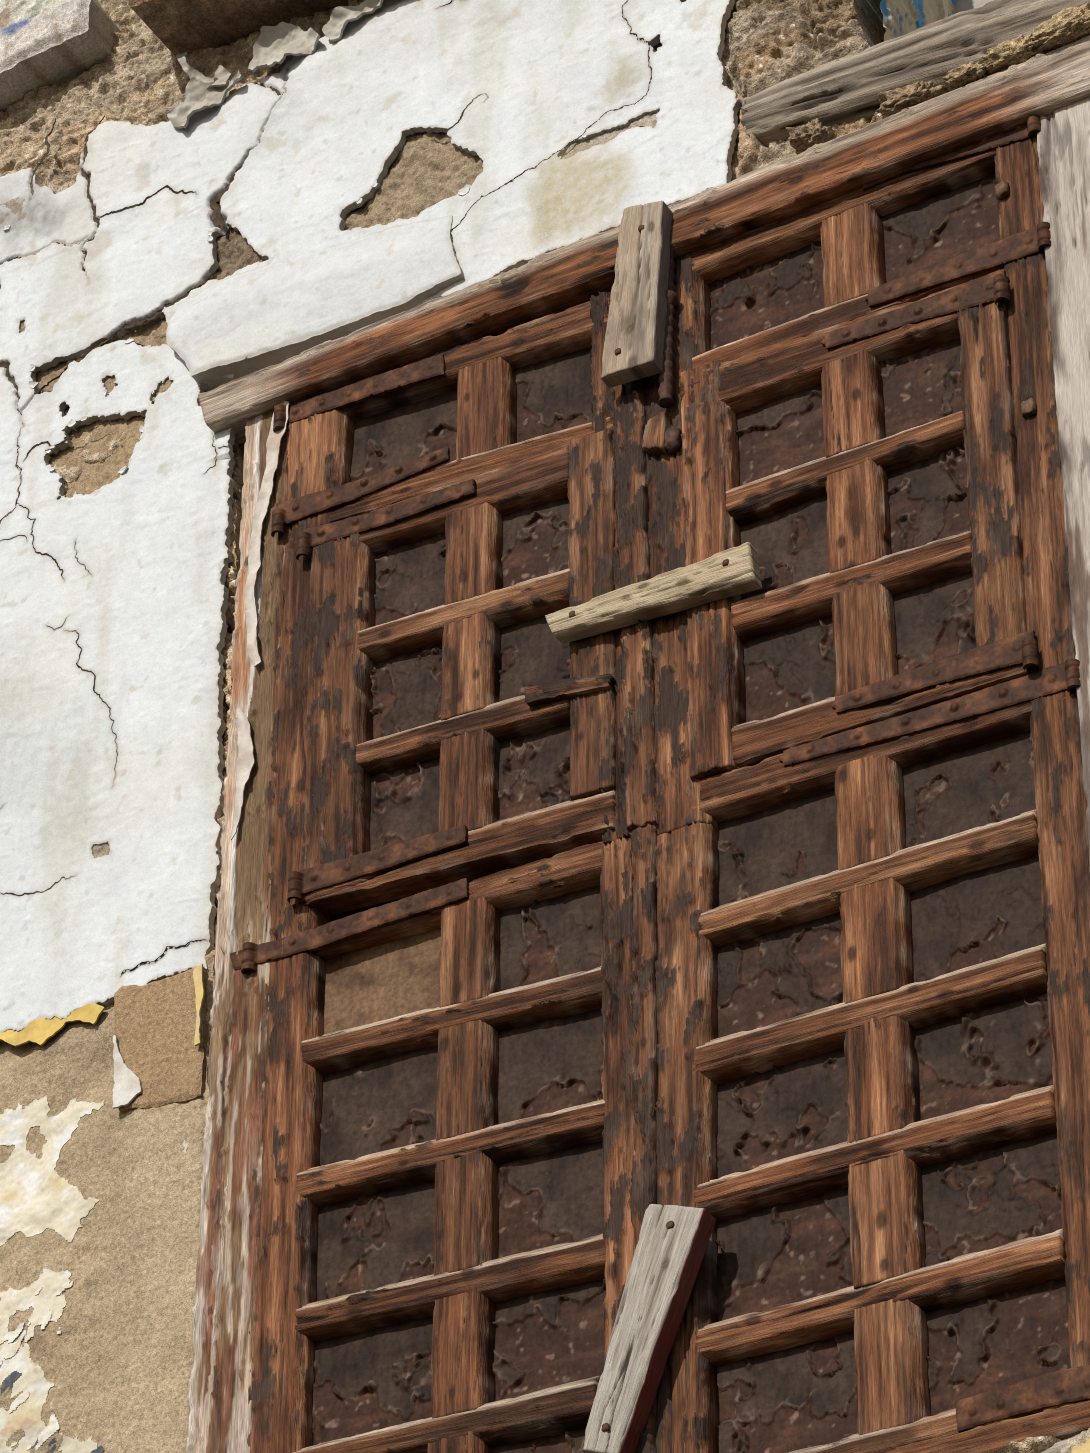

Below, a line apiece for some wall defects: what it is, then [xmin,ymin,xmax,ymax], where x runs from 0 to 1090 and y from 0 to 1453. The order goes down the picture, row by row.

crack [0,115,264,289]
flaking render [344,132,483,231]
crack [450,0,652,280]
crack [0,271,216,579]
flaking render [46,377,173,498]
crack [47,617,118,778]
crack [1,876,71,896]
peeling [0,1003,105,1047]
crack [120,939,206,977]
peeling [0,1035,142,1247]
peeling [0,1268,105,1453]
peeling [1070,1438,1090,1453]